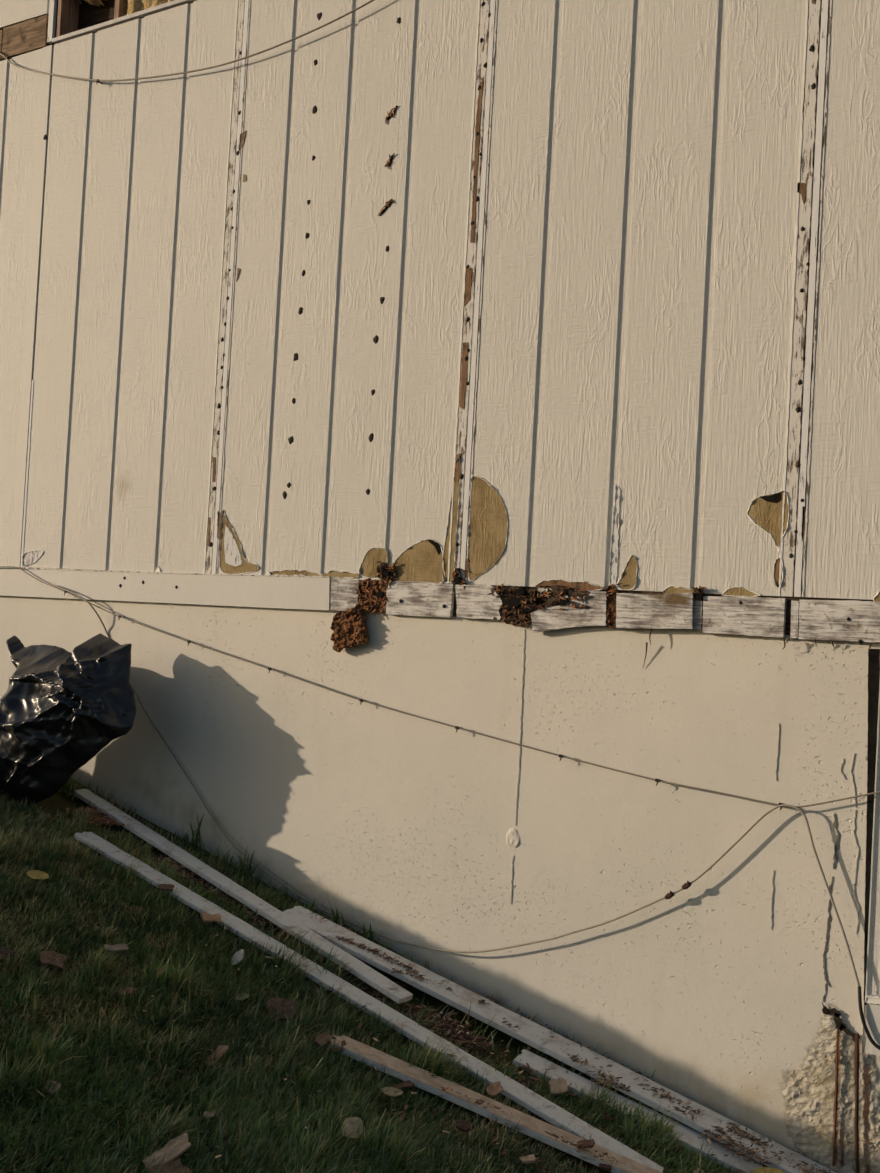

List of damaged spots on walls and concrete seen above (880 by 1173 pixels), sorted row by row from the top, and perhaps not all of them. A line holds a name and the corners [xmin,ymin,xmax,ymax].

peeling [470,81,483,243]
peeling [797,183,806,203]
peeling [464,267,472,306]
peeling [460,342,468,409]
peeling [207,454,508,583]
peeling [747,491,805,588]
crack [822,649,880,1042]
spalling [781,1005,880,1173]
rust [833,1034,870,1173]